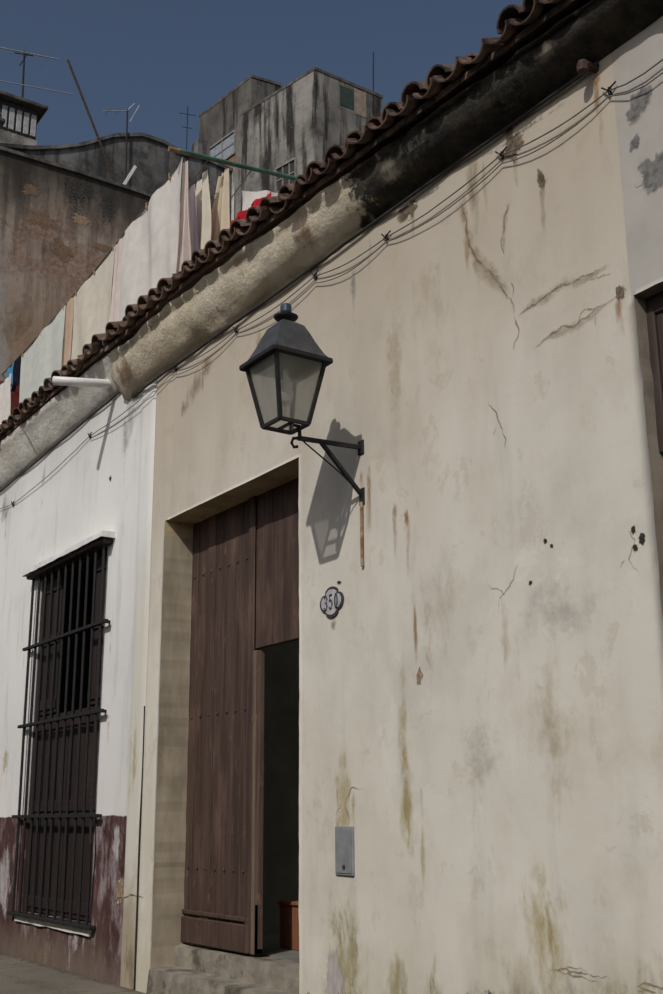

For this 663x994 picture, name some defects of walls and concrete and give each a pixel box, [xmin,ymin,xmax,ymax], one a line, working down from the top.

flaking render [626,85,652,151]
flaking render [634,152,663,193]
crack [463,212,610,341]
flaking render [630,526,646,553]